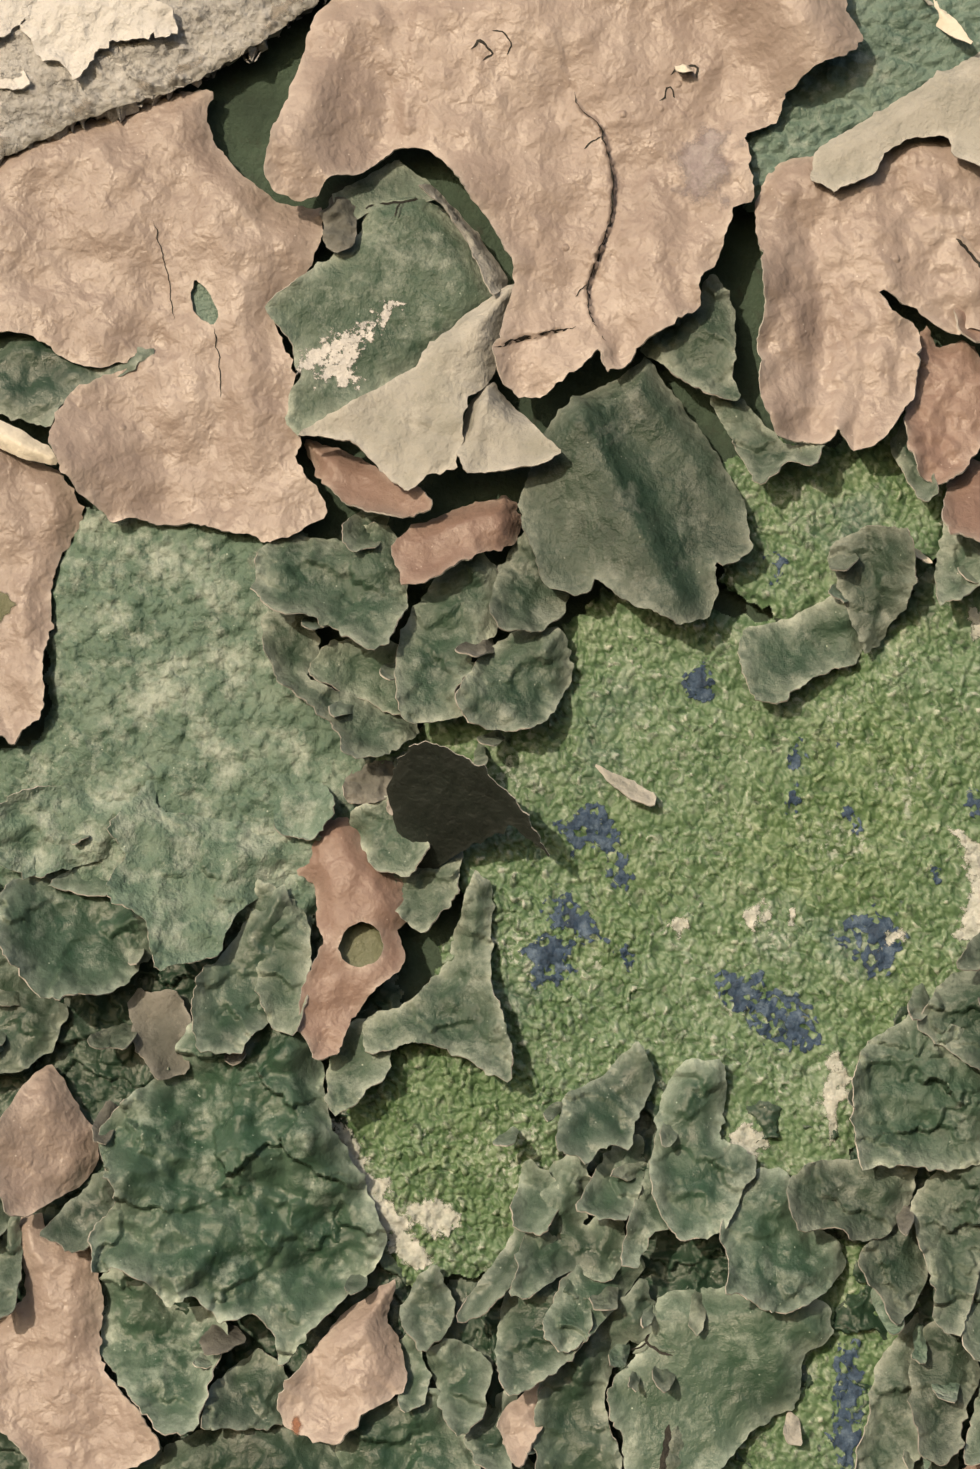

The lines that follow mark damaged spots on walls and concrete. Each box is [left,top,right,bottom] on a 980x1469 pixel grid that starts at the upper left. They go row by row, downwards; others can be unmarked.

peeling [0,61,31,91]
peeling [0,0,178,81]
peeling [0,89,574,767]
crack [497,92,614,347]
peeling [264,0,980,619]
peeling [0,357,980,1469]